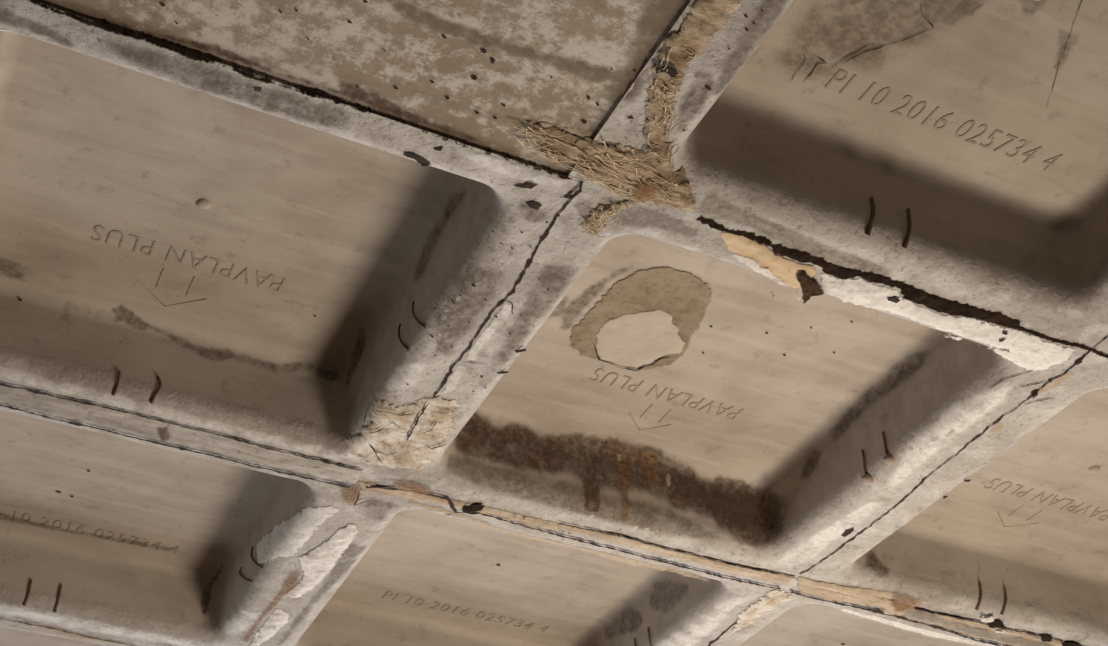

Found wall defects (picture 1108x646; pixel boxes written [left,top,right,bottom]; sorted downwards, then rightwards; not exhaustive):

spalling [655,66,679,78]
spalling [514,181,542,210]
crack [432,181,583,400]
peeling [570,267,712,371]
peeling [721,233,824,303]
damp [0,363,780,547]
crack [709,336,1108,646]